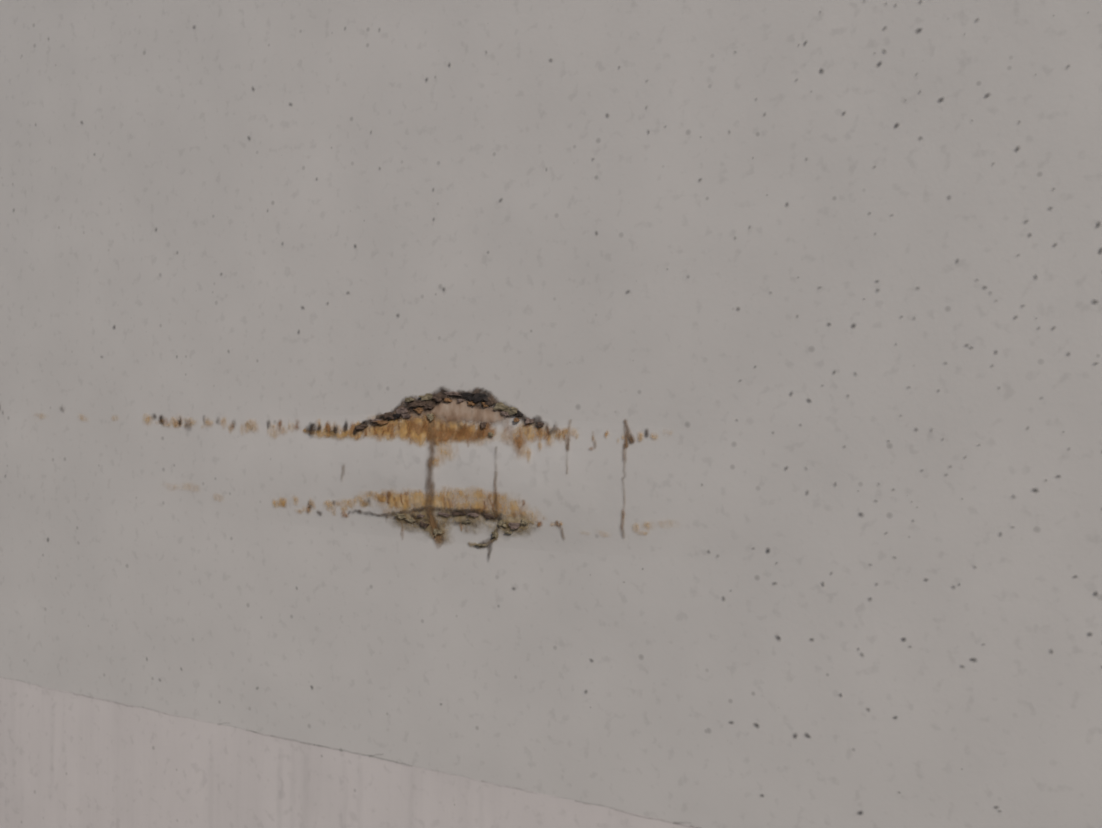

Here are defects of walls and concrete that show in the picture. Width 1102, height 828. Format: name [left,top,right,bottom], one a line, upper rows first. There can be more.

peeling [353,388,544,436]
corrosion [296,414,526,542]